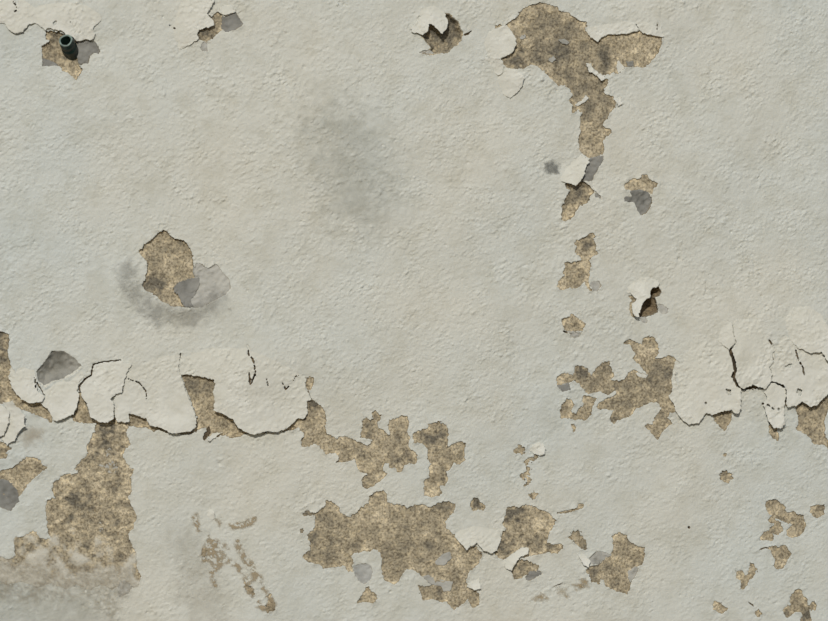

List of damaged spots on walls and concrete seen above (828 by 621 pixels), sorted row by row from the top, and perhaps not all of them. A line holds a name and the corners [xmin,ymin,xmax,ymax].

peeling [0,0,101,79]
peeling [169,0,243,51]
flaking render [411,6,469,55]
peeling [482,2,664,221]
peeling [139,230,230,308]
peeling [557,233,601,291]
peeling [556,306,828,448]
peeling [0,332,645,613]